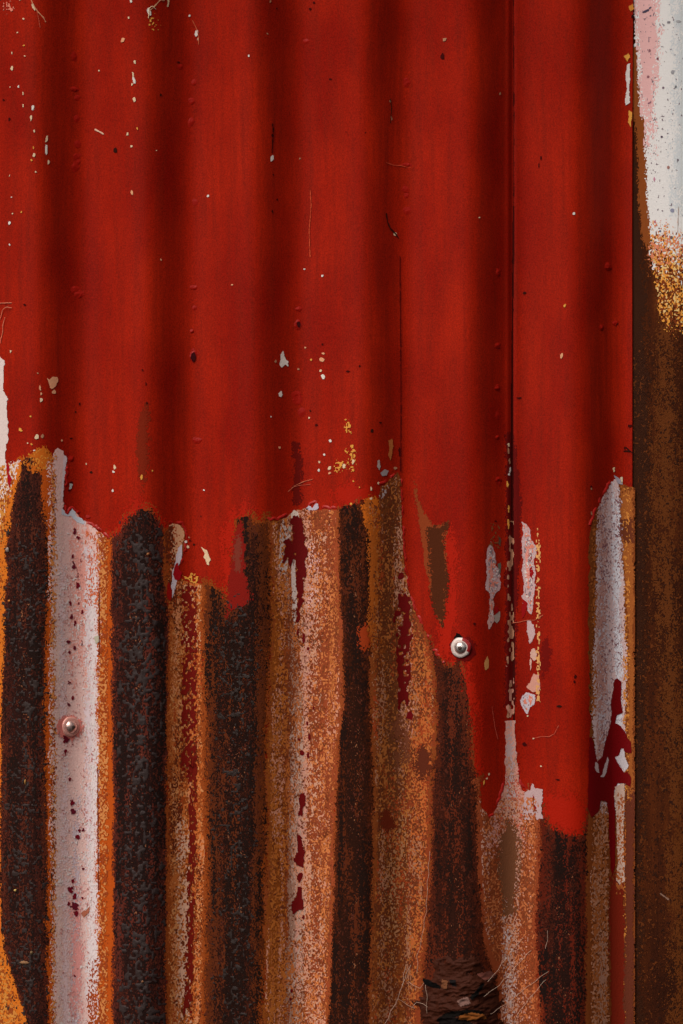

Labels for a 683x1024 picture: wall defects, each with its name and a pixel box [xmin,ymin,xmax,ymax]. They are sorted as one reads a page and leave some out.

rust [291,441,304,506]
peeling [318,419,379,500]
peeling [169,523,211,571]
rust [488,431,534,710]
peeling [473,505,541,718]
rust [539,638,553,679]
peeling [522,784,543,822]
peeling [595,749,629,884]